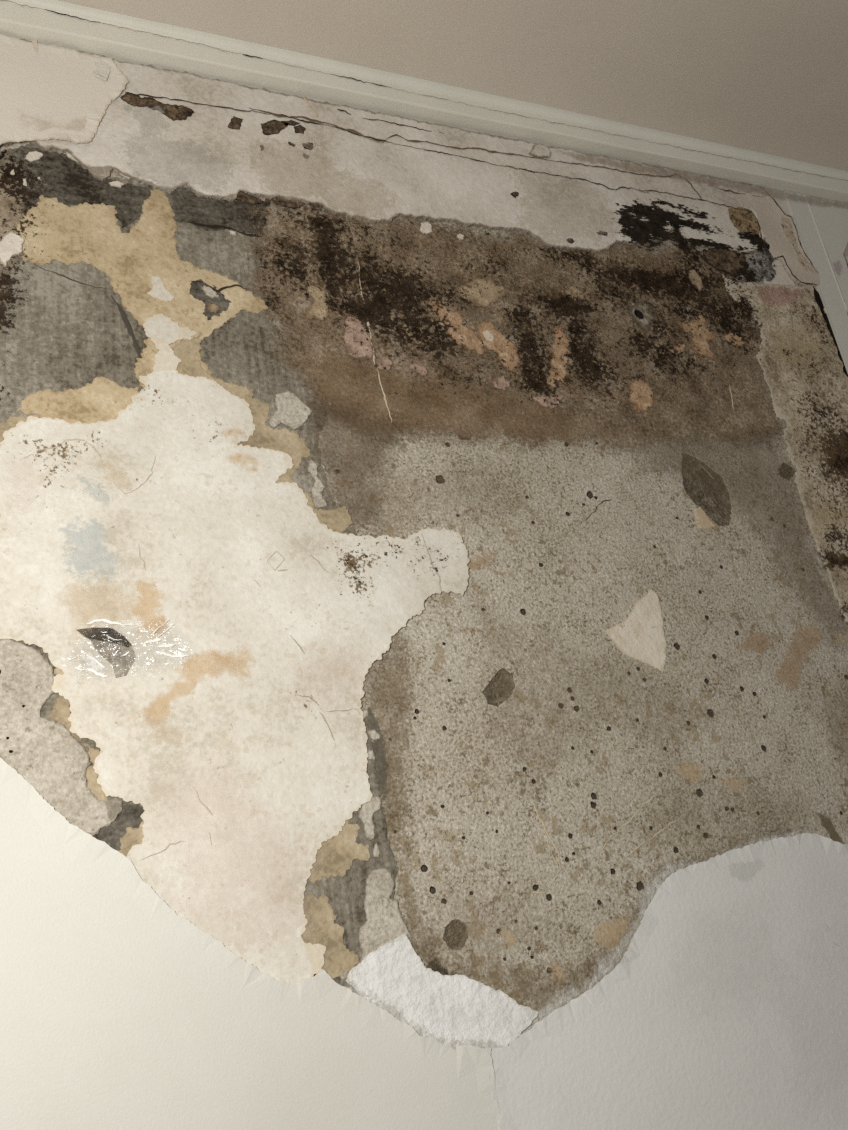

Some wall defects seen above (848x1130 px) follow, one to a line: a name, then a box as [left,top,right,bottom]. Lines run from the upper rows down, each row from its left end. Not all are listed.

damp [0,149,54,335]
peeling [0,51,820,983]
crack [0,0,848,285]
damp [241,199,848,598]